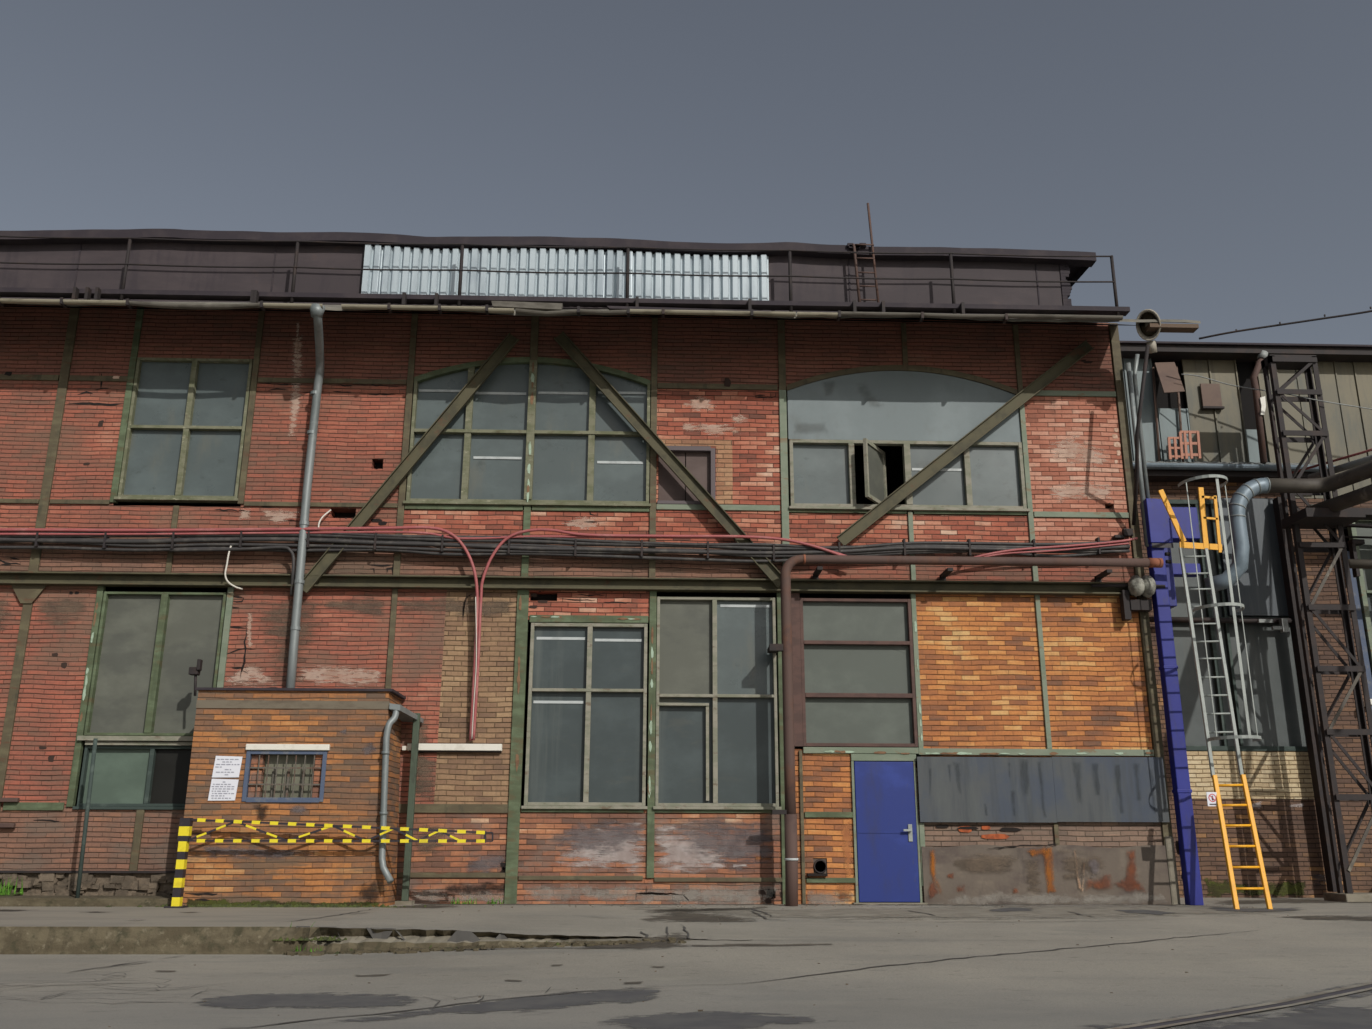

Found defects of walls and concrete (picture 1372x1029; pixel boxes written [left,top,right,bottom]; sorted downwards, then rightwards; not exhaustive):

leakage [289,323,303,436]
leakage [558,822,773,870]
corrosion [1014,848,1055,893]
corrosion [1089,852,1141,891]
leakage [534,887,831,949]
crack [738,910,1257,984]
crack [225,984,699,1029]